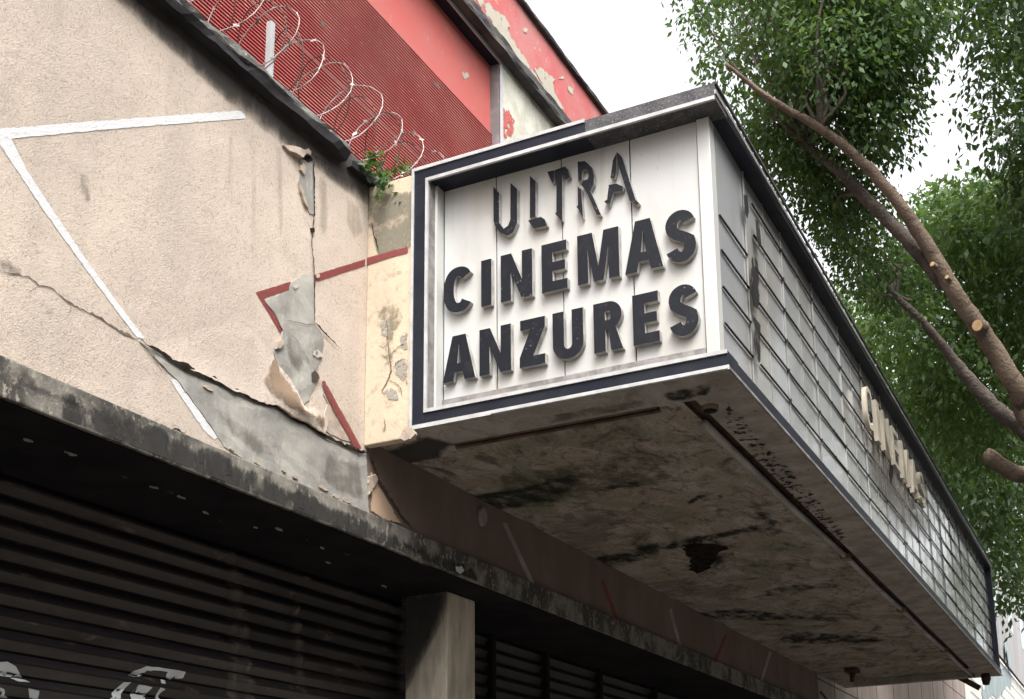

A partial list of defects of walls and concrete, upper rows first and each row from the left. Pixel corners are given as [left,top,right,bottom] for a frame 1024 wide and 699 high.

peeling [477,0,573,110]
spalling [282,145,315,215]
crack [0,272,412,528]
spalling [140,274,369,513]
water stain [265,358,325,427]
spalling [380,320,408,400]
water stain [666,386,709,401]
water stain [57,394,477,581]
water stain [471,475,578,509]
water stain [596,527,757,567]
water stain [700,610,880,644]